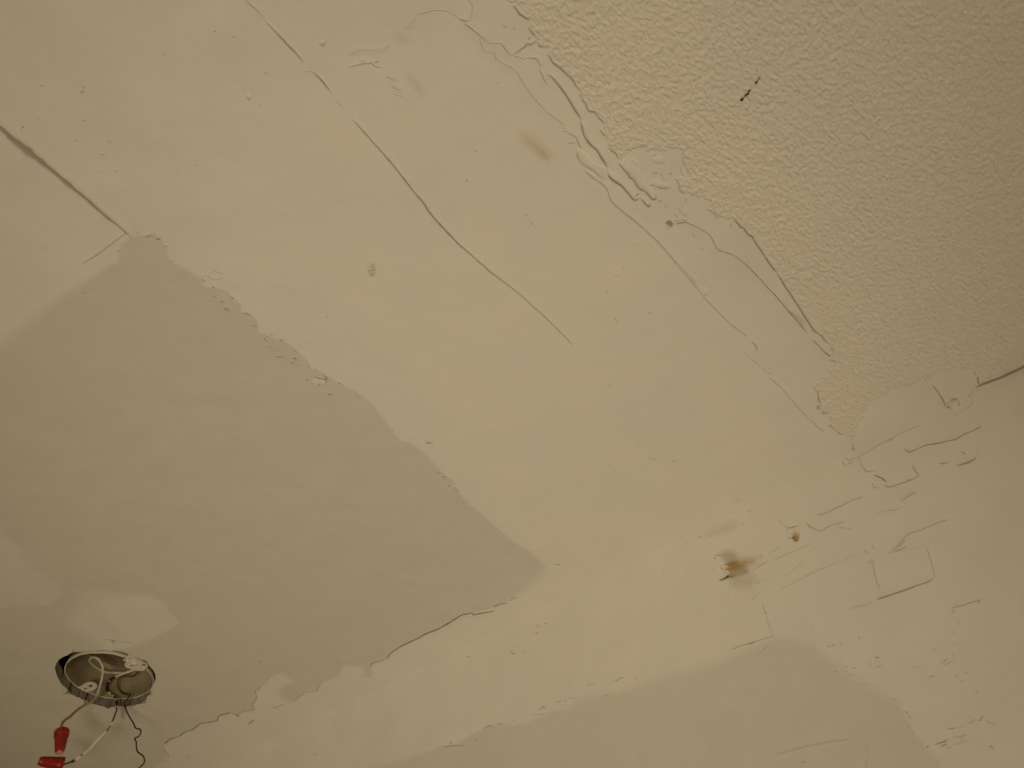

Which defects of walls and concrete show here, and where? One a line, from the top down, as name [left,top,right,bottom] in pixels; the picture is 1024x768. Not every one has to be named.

crack [0,108,135,265]
crack [245,0,575,346]
peeling [508,0,687,207]
crack [361,597,518,686]